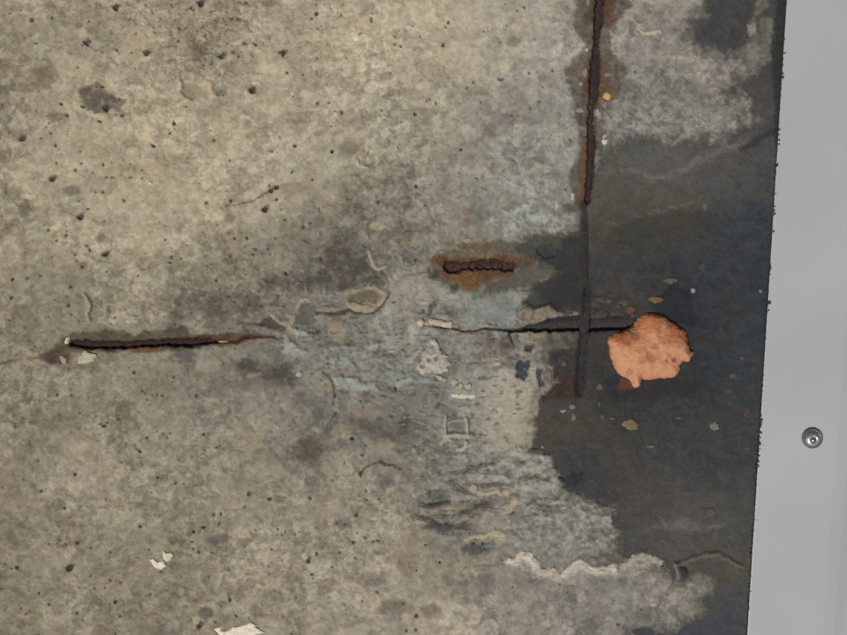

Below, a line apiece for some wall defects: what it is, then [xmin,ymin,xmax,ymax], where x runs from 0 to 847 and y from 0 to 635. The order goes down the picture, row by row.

corrosion [563,0,632,212]
spalling [442,259,516,274]
corrosion [429,241,555,293]
damp [417,303,454,329]
damp [462,0,787,635]
corrosion [39,327,267,364]
peeling [213,622,264,635]